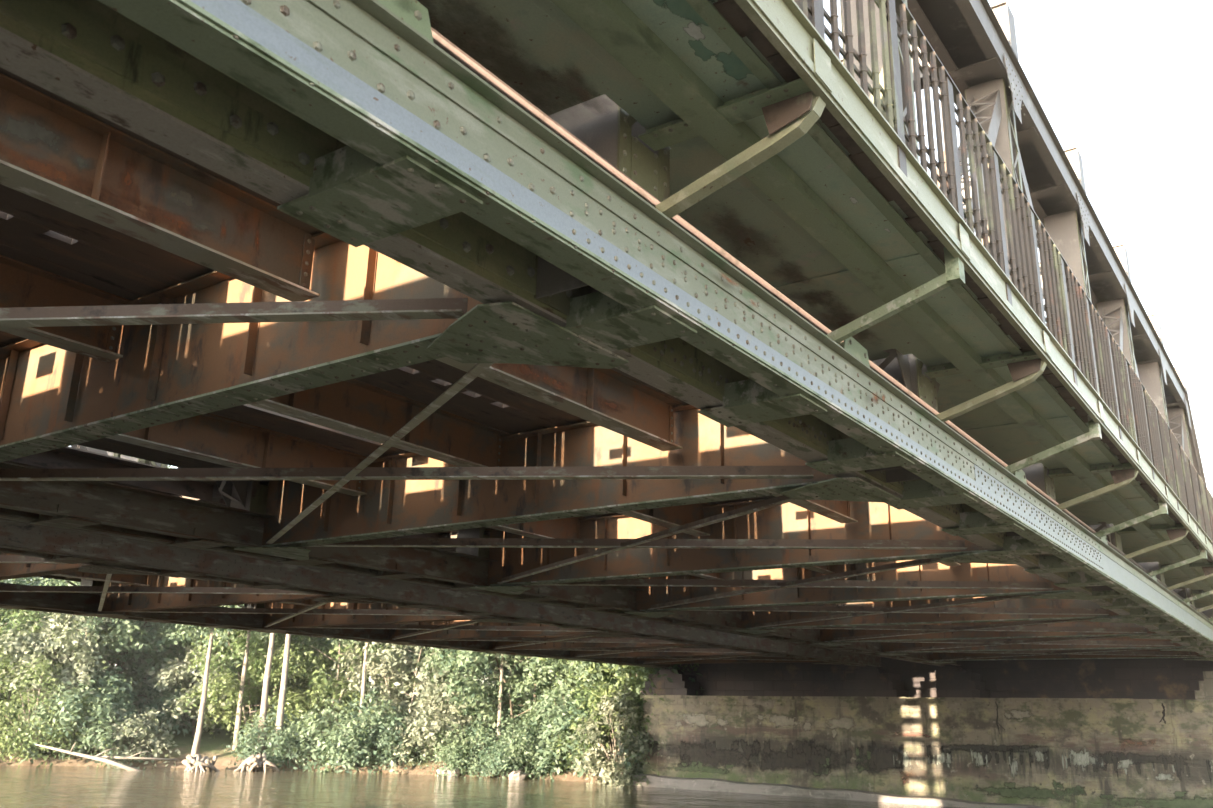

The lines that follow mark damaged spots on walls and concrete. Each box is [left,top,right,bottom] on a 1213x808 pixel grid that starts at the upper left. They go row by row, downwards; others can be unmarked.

corrosion [428,12,600,110]
peeling [653,0,754,81]
corrosion [0,145,132,213]
damp [666,713,912,776]
damp [923,744,1212,783]